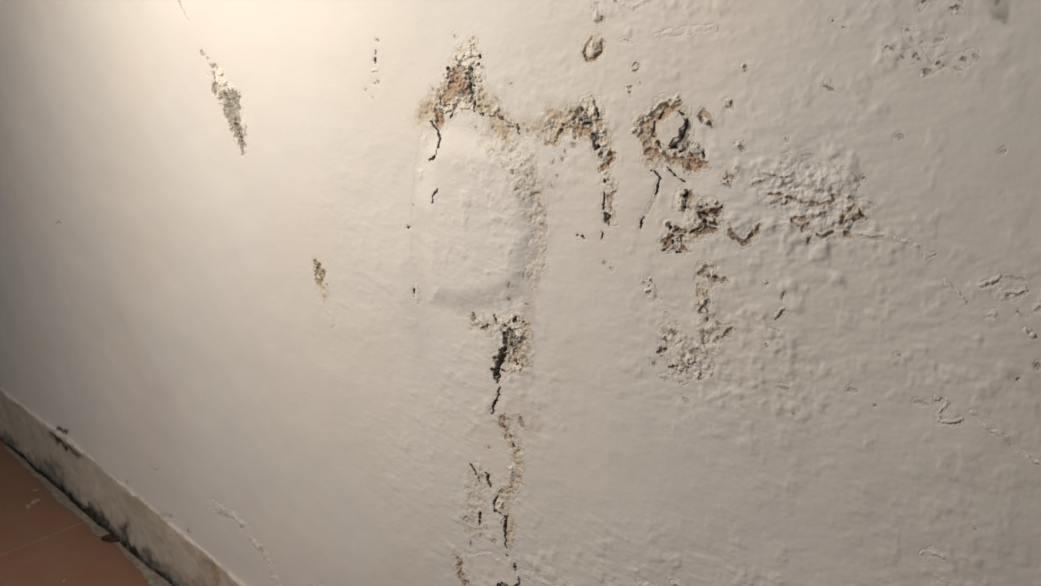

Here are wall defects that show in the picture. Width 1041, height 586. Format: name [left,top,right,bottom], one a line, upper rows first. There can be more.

peeling [199,48,249,160]
peeling [311,257,338,328]
peeling [416,31,886,405]
water stain [0,434,176,586]
crack [460,384,528,571]